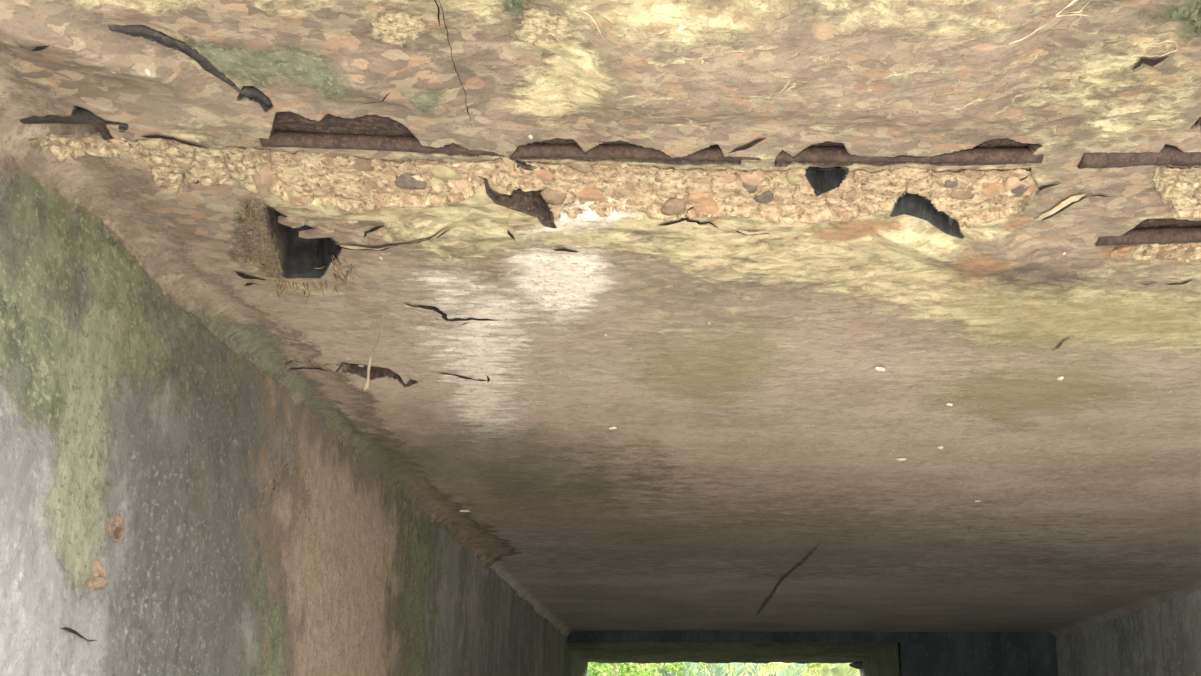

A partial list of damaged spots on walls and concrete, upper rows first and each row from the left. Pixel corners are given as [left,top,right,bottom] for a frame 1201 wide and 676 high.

spalling [125,25,217,77]
spalling [29,86,1042,279]
corrosion [259,131,1044,163]
corrosion [1077,144,1201,169]
spalling [1110,145,1201,262]
crack [335,225,449,251]
corrosion [1095,227,1201,259]
crack [404,303,500,325]
water stain [401,195,637,450]
water stain [0,49,517,676]
crack [440,373,490,383]
crack [756,544,819,615]